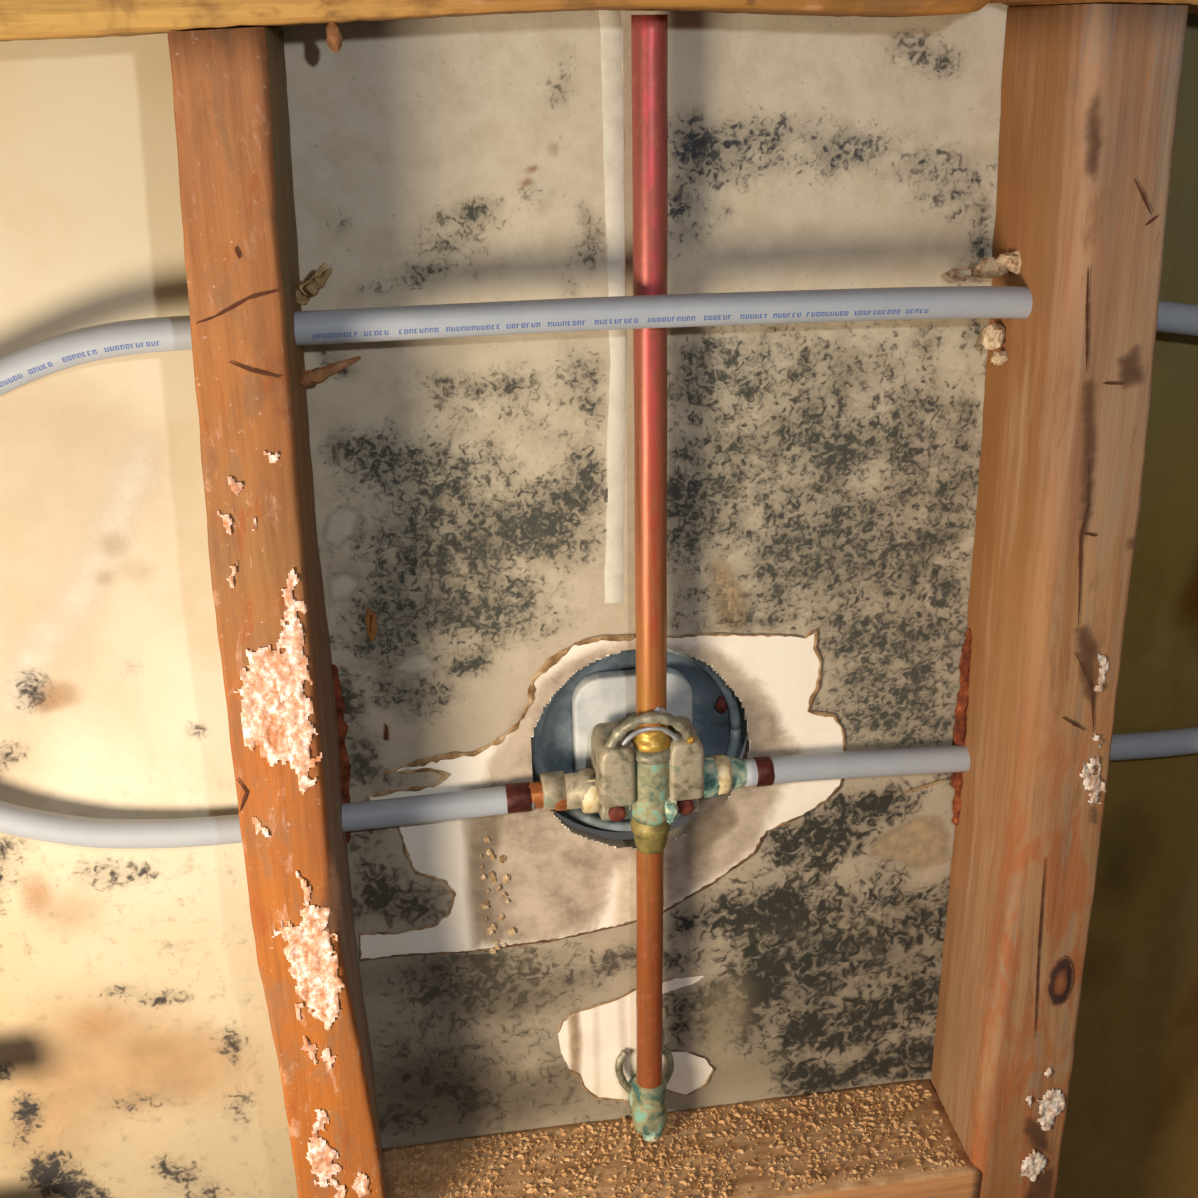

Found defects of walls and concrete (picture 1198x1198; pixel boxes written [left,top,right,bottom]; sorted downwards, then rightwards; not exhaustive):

crack [196,289,285,324]
crack [229,361,281,378]
water stain [325,422,608,784]
water stain [667,320,980,759]
peeling [365,635,636,801]
water stain [483,642,636,788]
peeling [667,628,847,755]
peeling [359,818,637,962]
water stain [379,809,637,1134]
peeling [663,779,843,913]
water stain [662,783,950,1095]
peeling [558,989,636,1102]